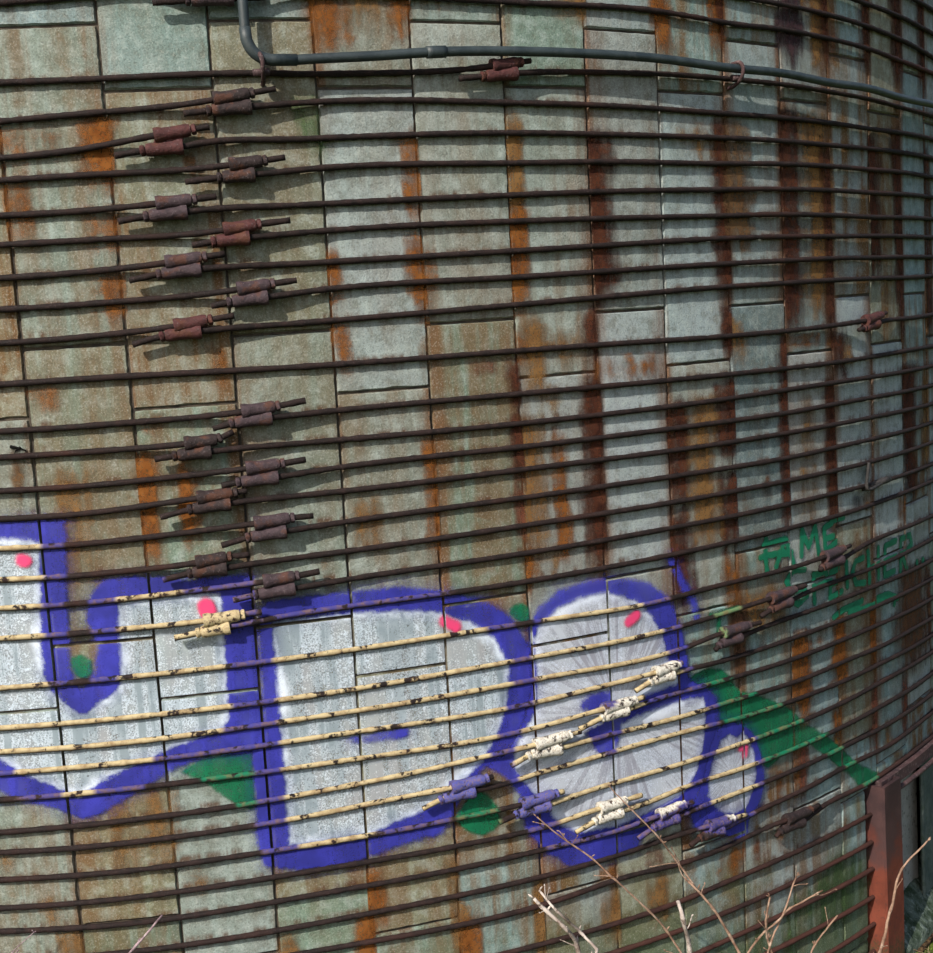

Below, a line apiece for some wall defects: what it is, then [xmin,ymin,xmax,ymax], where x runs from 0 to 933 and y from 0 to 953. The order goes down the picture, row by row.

rust [649,0,671,50]
rust [706,0,726,48]
rust [774,0,837,68]
rust [888,0,903,83]
rust [77,115,115,181]
rust [868,134,906,338]
rust [924,142,933,335]
rust [505,117,620,596]
rust [778,105,852,526]
rust [899,364,929,523]
rust [355,867,387,953]
rust [450,902,483,953]